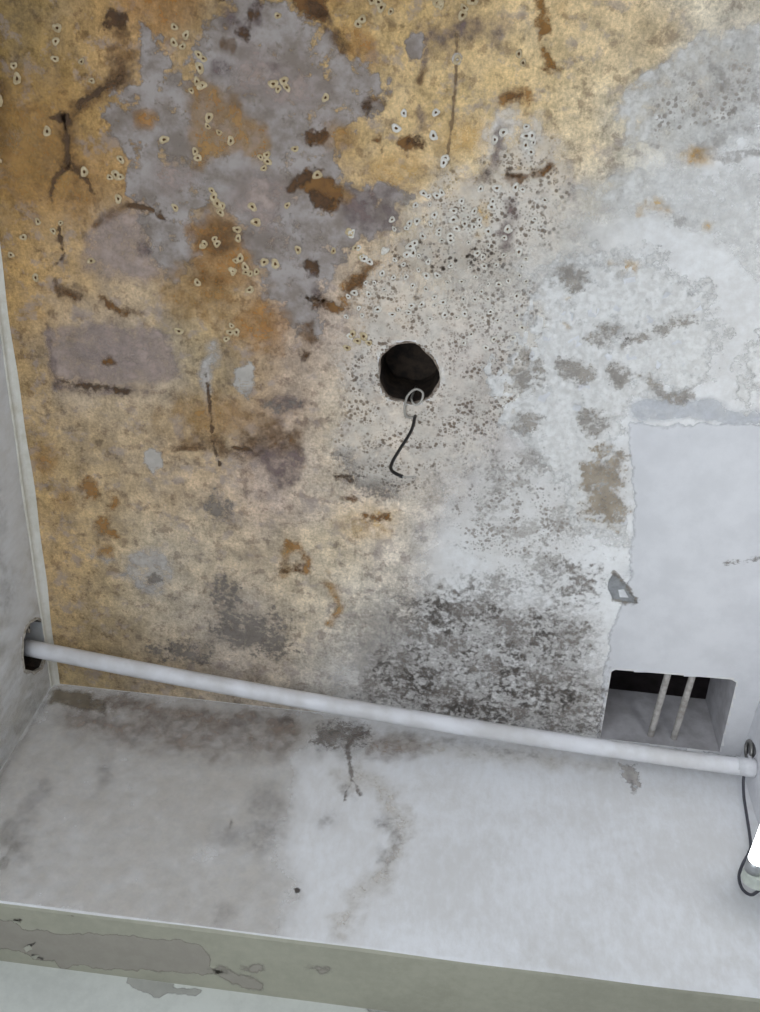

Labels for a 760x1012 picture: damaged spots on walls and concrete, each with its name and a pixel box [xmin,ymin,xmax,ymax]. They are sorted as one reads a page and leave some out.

rust [293,0,346,54]
rust [535,0,556,71]
crack [49,75,124,197]
peeling [86,0,416,339]
rust [286,167,350,212]
crack [447,33,462,164]
rust [305,261,378,314]
damp [0,0,760,735]
crack [176,374,251,466]
flaking render [608,570,637,604]
damp [0,662,418,933]
peeling [0,919,263,998]